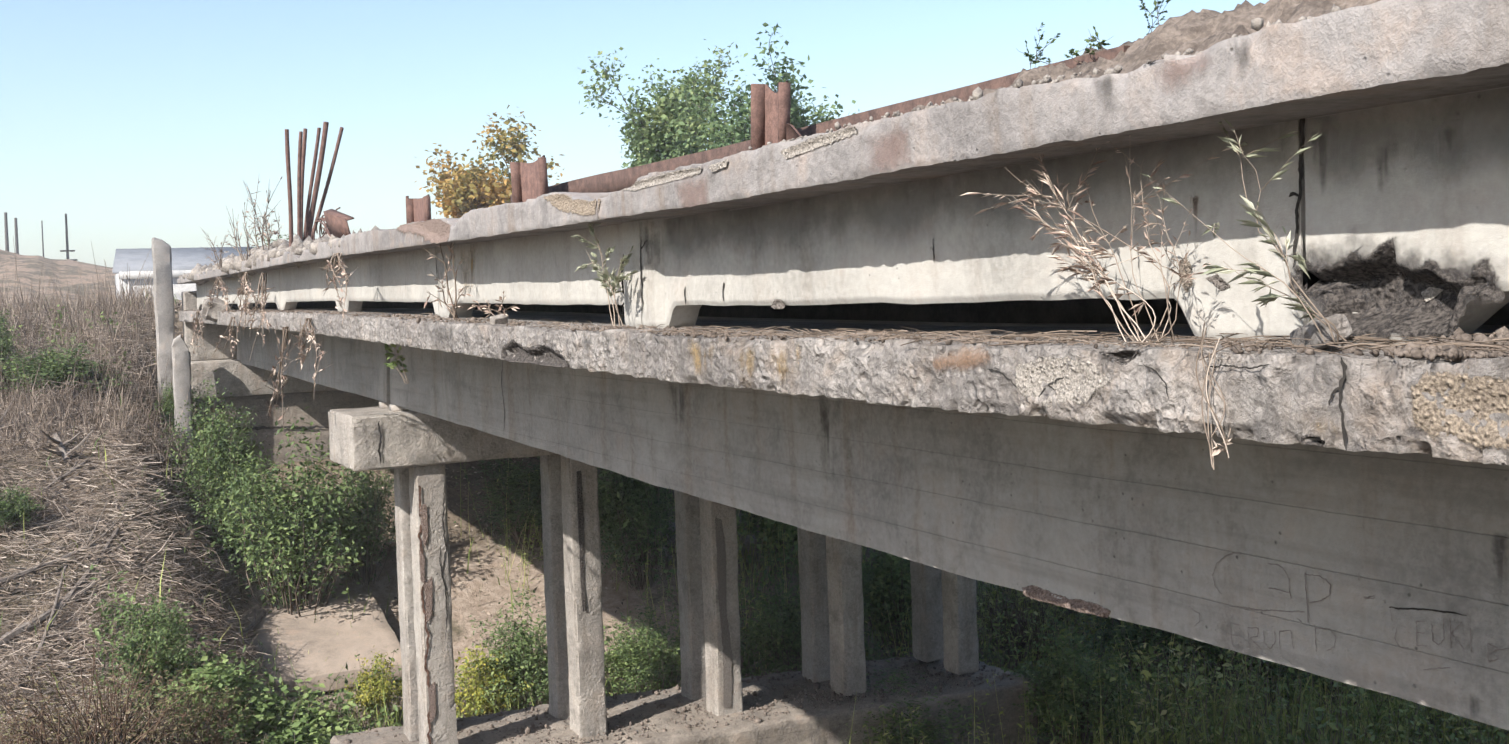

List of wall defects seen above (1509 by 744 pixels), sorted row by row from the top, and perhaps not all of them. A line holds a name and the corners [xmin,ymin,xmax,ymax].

crack [1289,118,1305,269]
spalling [1288,237,1504,343]
spalling [501,339,569,368]
crack [1328,357,1347,449]
crack [439,485,448,639]
spalling [1022,585,1111,618]